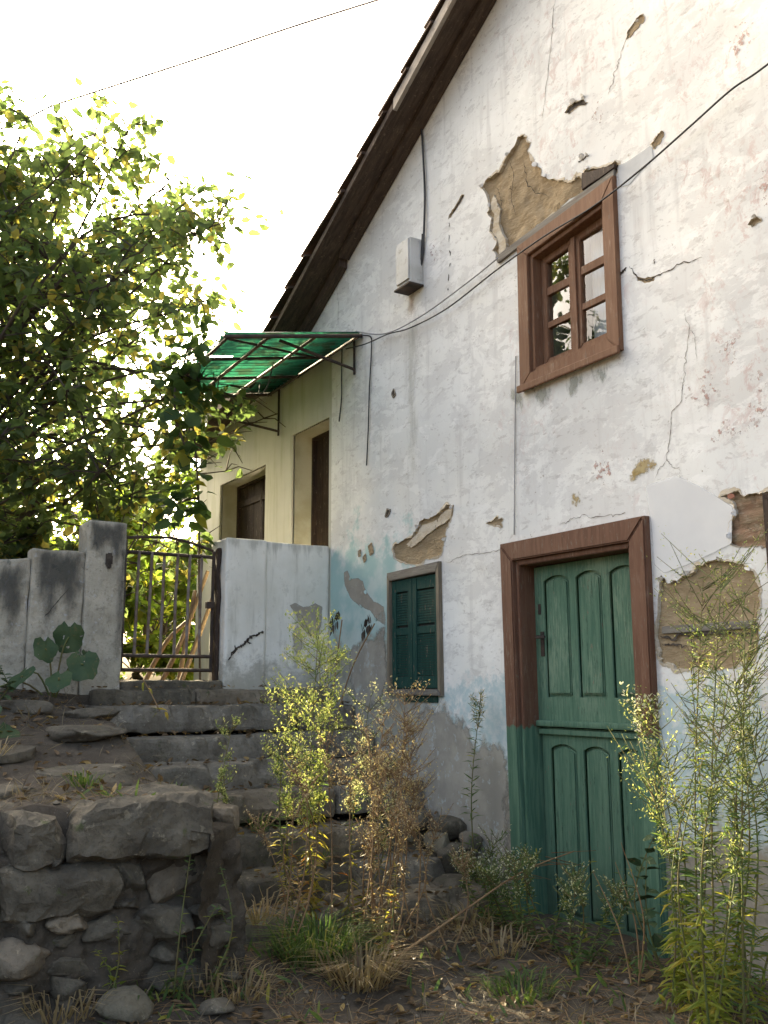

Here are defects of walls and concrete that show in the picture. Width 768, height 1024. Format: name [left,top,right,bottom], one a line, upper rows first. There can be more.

spalling [608,14,645,94]
spalling [565,94,601,123]
spalling [479,134,621,259]
crack [620,257,700,283]
crack [657,317,697,478]
damp [93,522,124,558]
spalling [392,502,454,566]
spalling [718,487,768,549]
damp [0,568,20,614]
damp [40,551,80,616]
crack [228,631,264,660]
spalling [654,557,763,675]